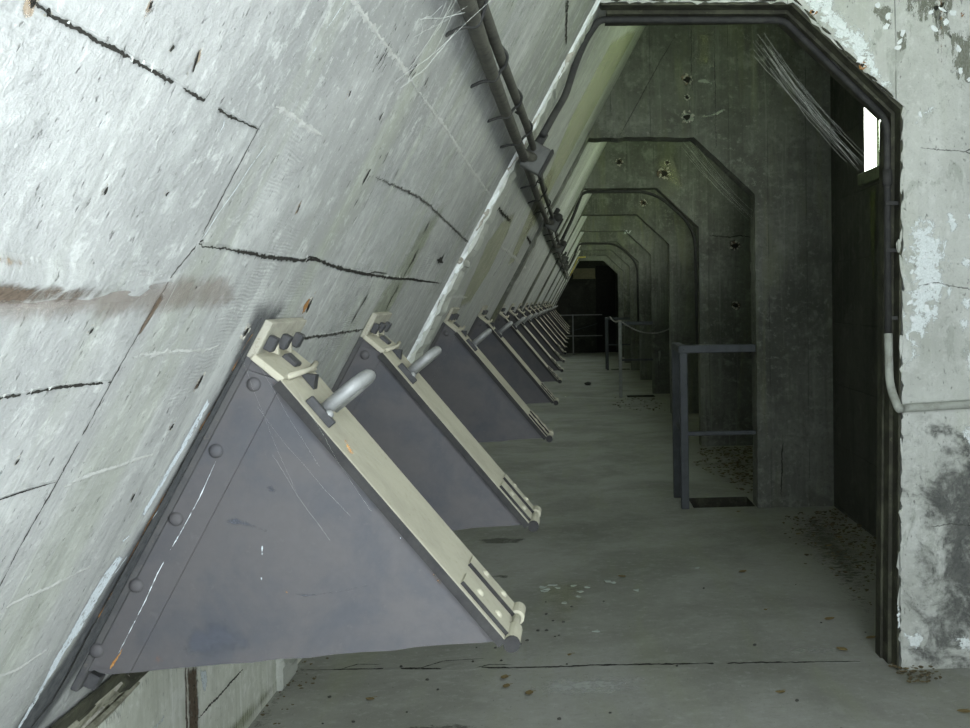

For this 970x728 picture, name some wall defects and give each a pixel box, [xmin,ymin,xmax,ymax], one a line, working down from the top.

crack [33,0,260,130]
peeling [873,0,970,83]
spalling [681,73,695,123]
crack [377,178,469,242]
spalling [407,0,620,361]
spalling [794,0,908,315]
crack [199,238,444,283]
crack [0,380,112,400]
crack [0,480,55,500]
spalling [896,544,904,607]
leakage [897,424,970,668]